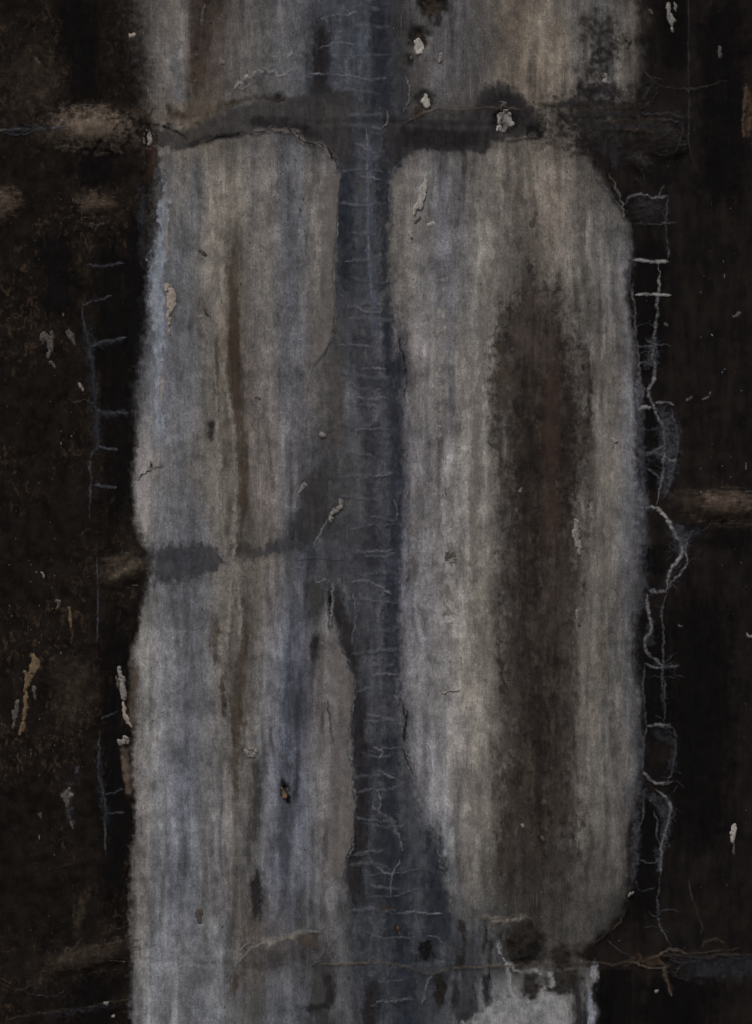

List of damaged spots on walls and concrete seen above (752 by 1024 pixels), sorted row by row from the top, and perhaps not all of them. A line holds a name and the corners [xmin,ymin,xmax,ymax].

peeling [415,93,433,119]
crack [355,80,521,313]
peeling [492,101,514,133]
crack [594,0,725,225]
peeling [164,283,176,336]
leakage [0,0,544,1024]
leakage [448,0,752,1024]
peeling [12,653,40,736]
peeling [115,666,139,794]
crack [228,249,752,1003]